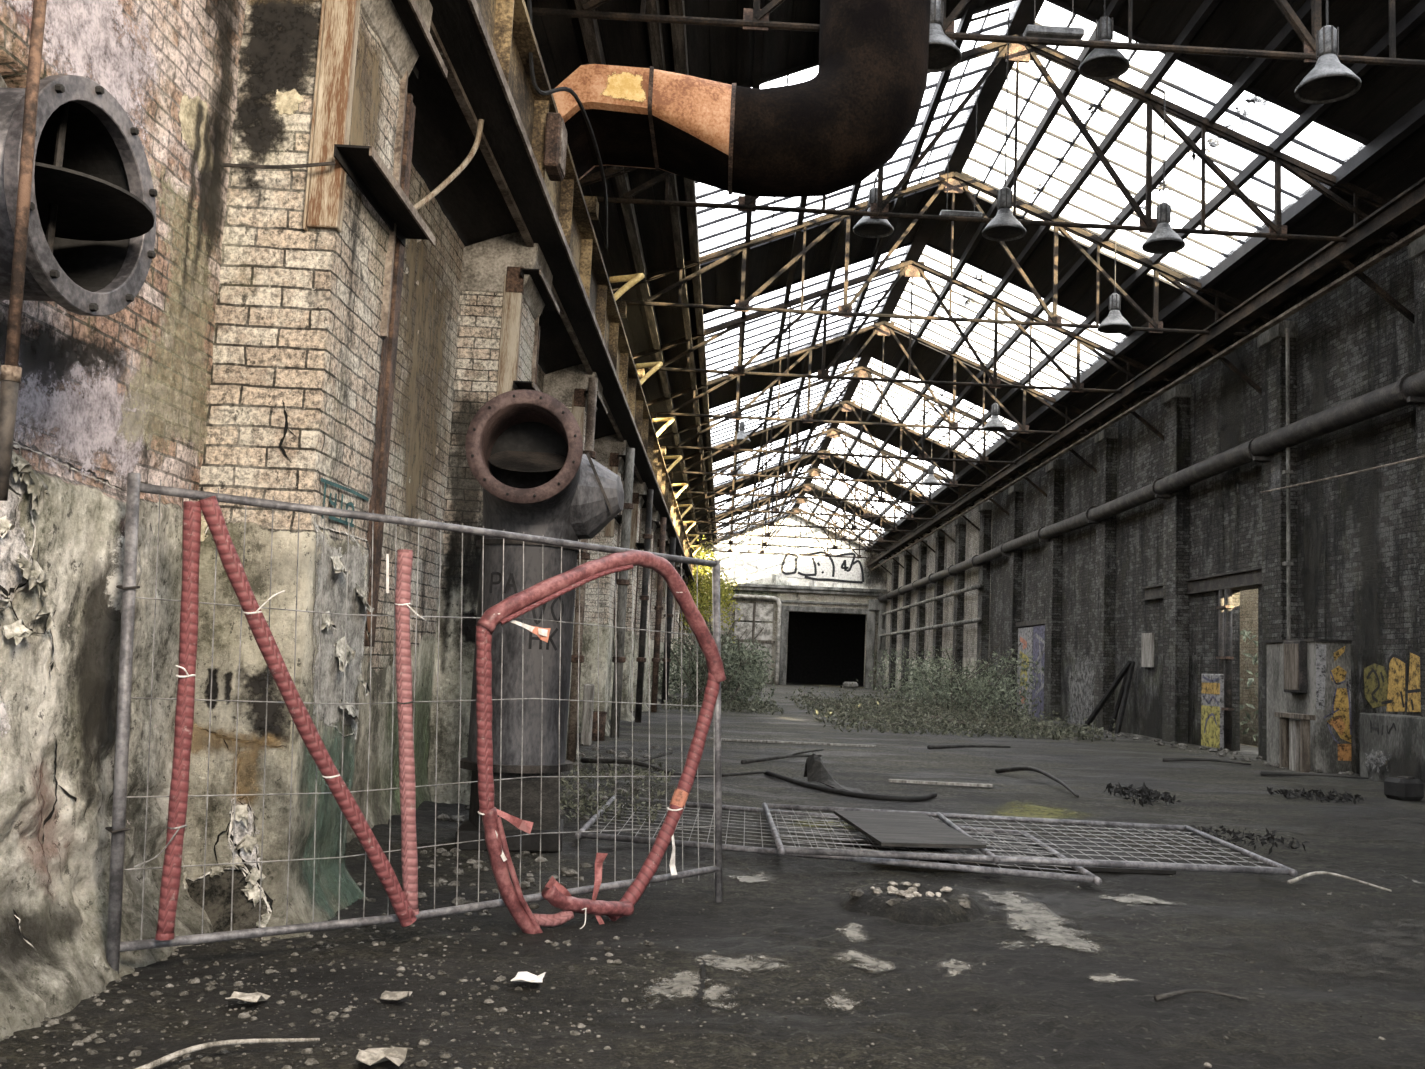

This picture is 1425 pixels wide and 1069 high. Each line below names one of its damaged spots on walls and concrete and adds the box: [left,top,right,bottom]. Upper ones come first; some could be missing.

water stain [182,0,238,299]
crack [279,400,295,463]
peeling [0,445,57,646]
water stain [78,546,138,816]
peeling [183,797,271,942]